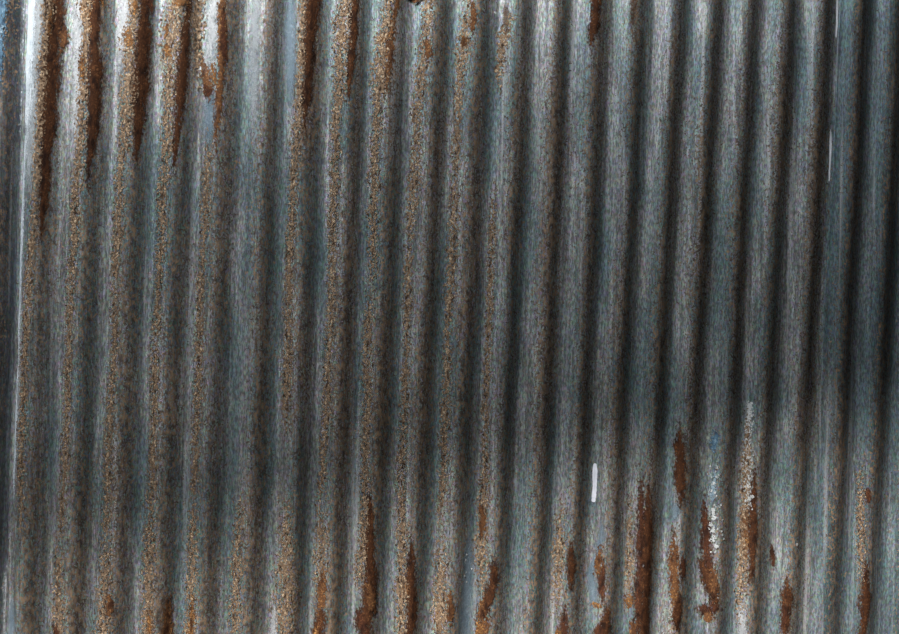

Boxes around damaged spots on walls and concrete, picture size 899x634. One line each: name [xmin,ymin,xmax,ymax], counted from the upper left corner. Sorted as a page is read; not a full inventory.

corrosion [671,421,687,507]
corrosion [666,492,720,633]